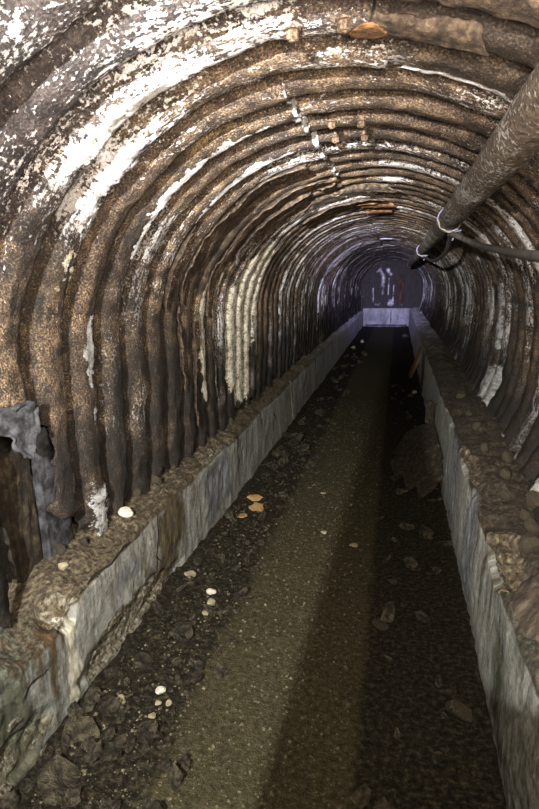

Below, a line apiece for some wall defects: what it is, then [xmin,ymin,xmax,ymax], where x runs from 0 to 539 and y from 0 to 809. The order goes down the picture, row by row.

damp [282,87,339,176]
peeling [0,395,42,459]